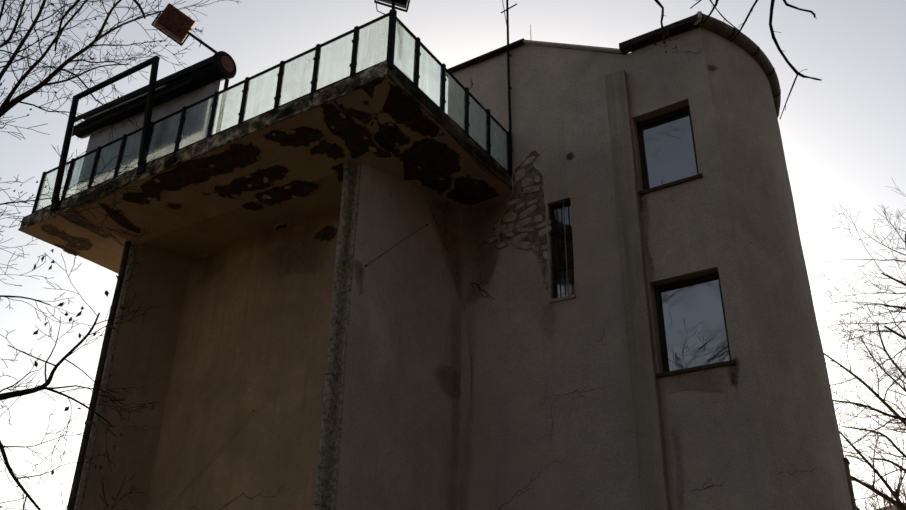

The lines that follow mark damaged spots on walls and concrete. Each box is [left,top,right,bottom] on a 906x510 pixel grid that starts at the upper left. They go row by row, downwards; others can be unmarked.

spalling [41,213,113,256]
spalling [98,77,552,289]